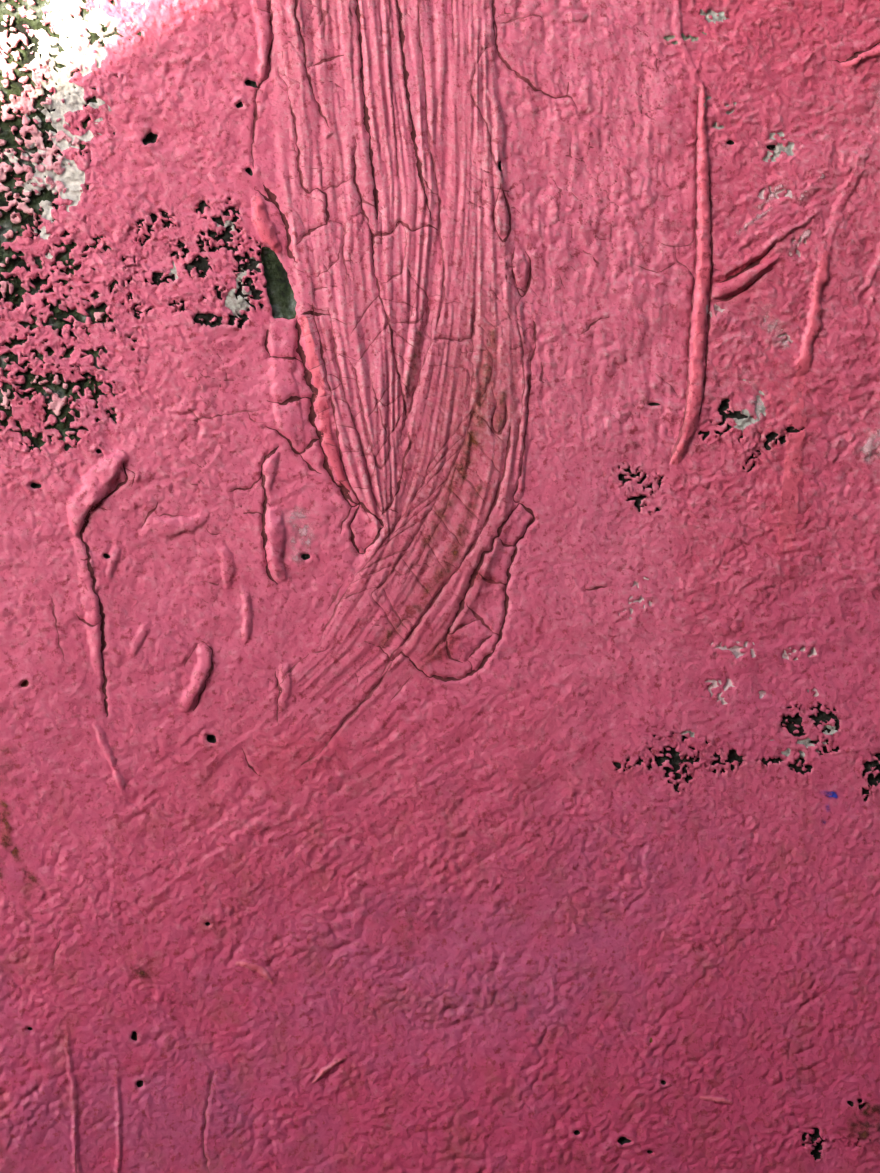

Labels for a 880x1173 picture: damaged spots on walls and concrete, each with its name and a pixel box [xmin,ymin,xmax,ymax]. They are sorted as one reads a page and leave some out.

peeling [0,0,282,452]
crack [178,0,777,767]
peeling [698,391,804,472]
crack [141,502,219,535]
peeling [618,463,664,513]
crack [50,462,135,717]
spalling [711,641,756,658]
spalling [702,679,735,705]
peeling [613,731,744,793]
peeling [761,688,840,775]
peeling [862,753,880,802]
peeling [802,1128,827,1161]